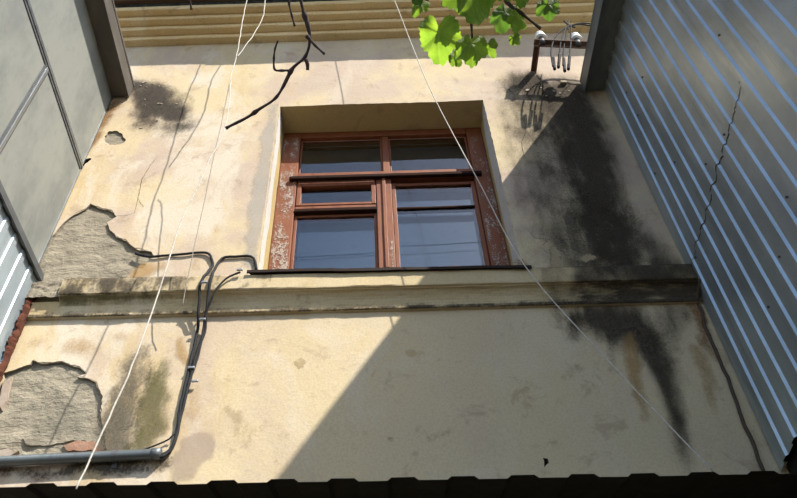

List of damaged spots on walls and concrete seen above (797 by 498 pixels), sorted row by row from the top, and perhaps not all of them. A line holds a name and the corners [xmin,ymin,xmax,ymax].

spalling [105,131,126,145]
leakage [130,81,190,131]
spalling [25,204,153,298]
crack [78,156,158,253]
peeling [271,137,298,269]
leakage [506,74,703,446]
spalling [0,361,106,456]
leakage [99,356,151,451]